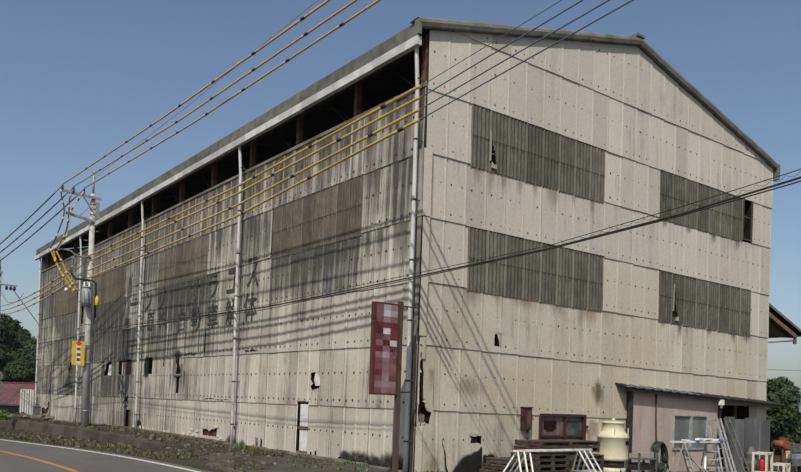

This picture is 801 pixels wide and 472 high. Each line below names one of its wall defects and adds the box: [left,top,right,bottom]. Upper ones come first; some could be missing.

spalling [416,357,434,425]
spalling [182,425,223,439]